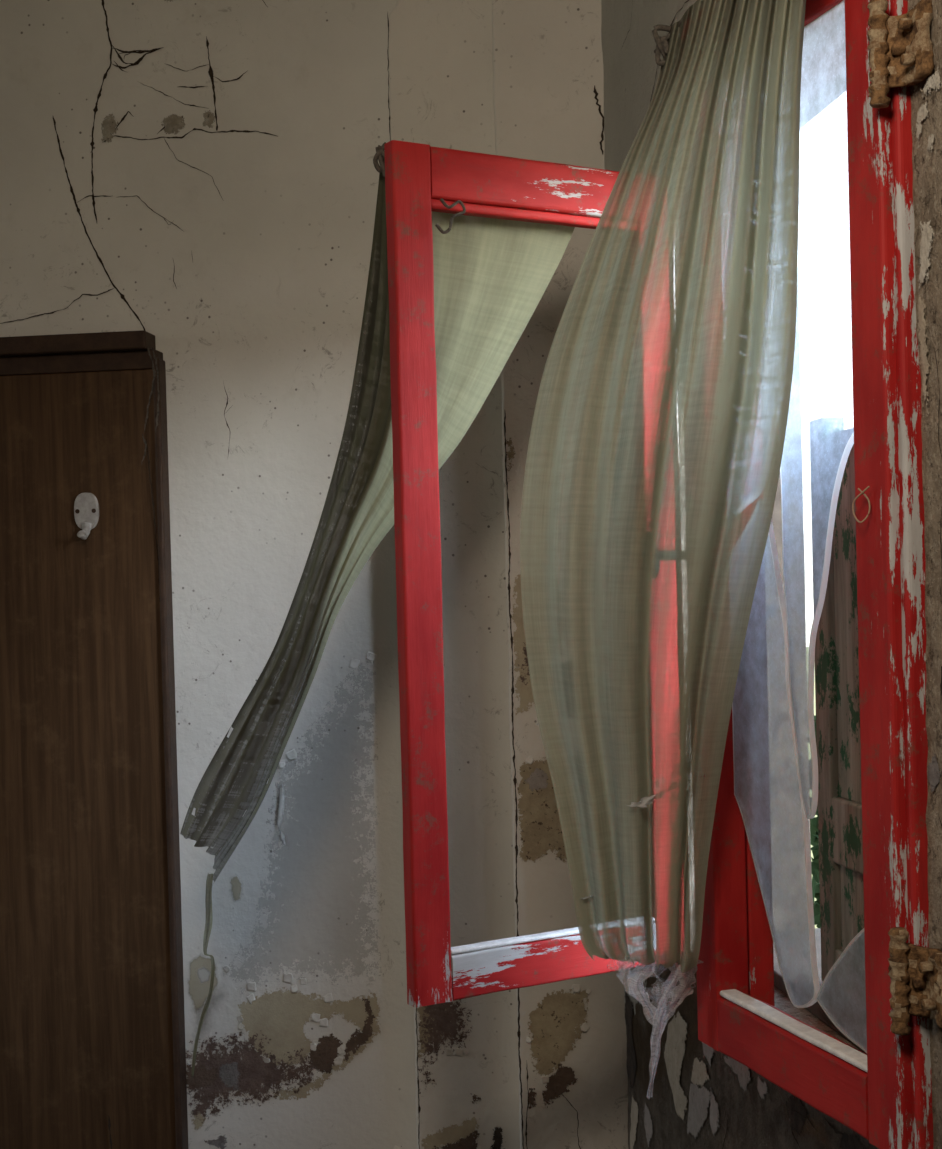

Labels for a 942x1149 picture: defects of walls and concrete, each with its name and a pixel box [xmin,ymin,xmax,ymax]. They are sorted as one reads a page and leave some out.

crack [0,0,276,331]
peeling [912,66,942,153]
peeling [917,220,934,416]
peeling [511,573,534,715]
peeling [517,755,567,863]
spalling [927,755,941,792]
peeling [186,973,381,1149]
peeling [421,1094,503,1149]
spalling [625,992,654,1149]
peeling [664,1011,768,1139]